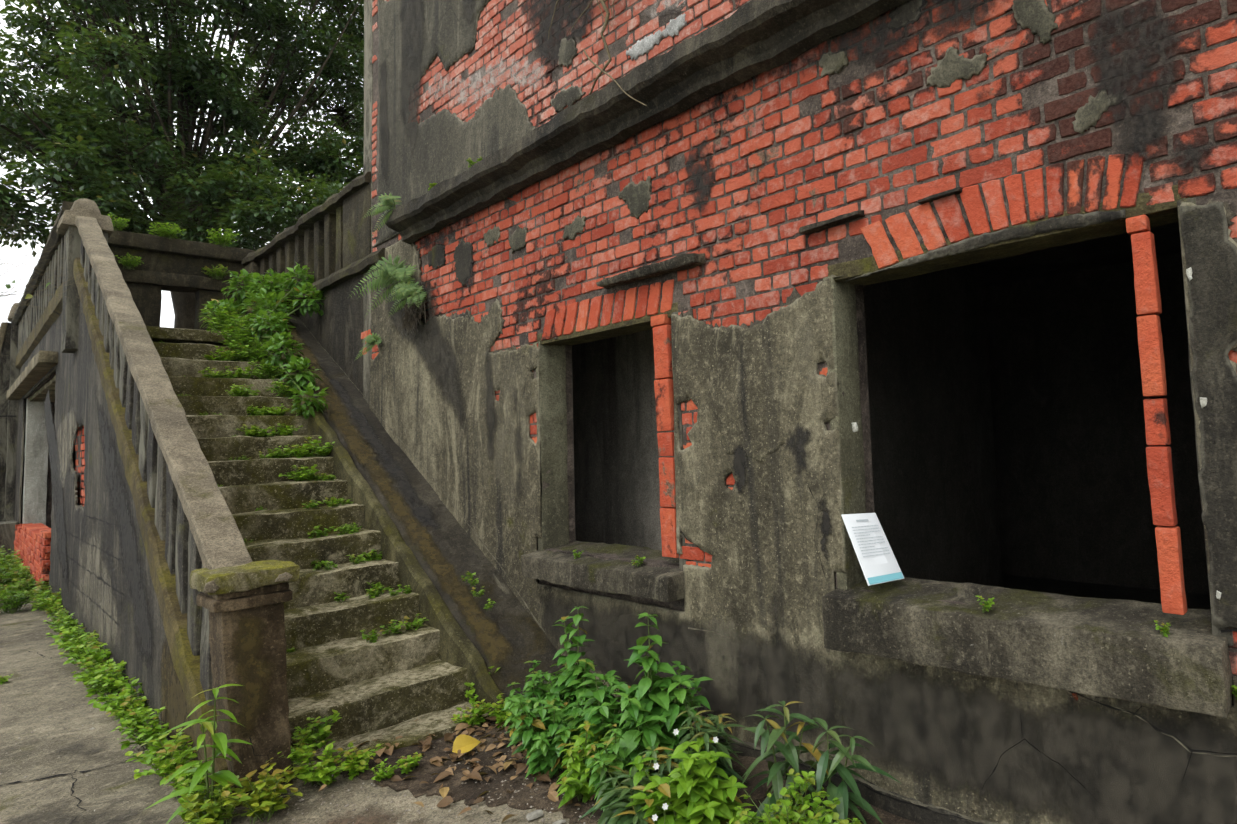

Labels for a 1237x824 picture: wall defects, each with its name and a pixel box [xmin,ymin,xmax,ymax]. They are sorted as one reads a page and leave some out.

flaking render [398,0,1237,352]
flaking render [681,400,698,449]
damp [733,439,747,493]
damp [786,425,810,471]
damp [818,501,832,559]
flaking render [1228,631,1237,675]
crack [1066,690,1233,781]